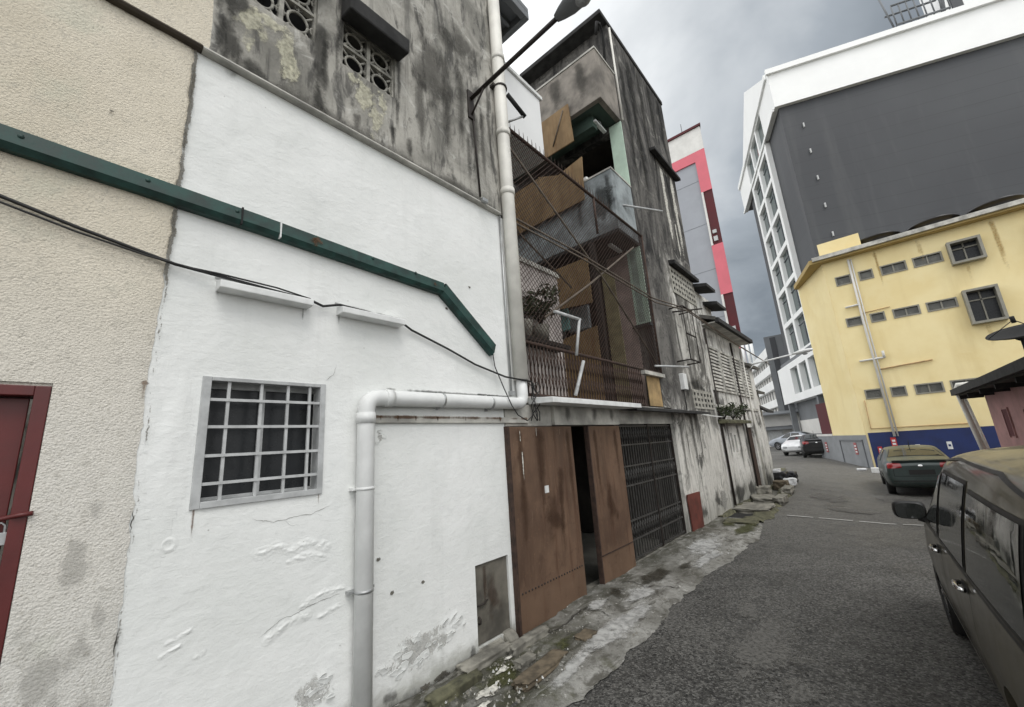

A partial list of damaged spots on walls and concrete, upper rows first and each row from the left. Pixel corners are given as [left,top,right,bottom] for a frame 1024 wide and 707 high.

damp [314,1,343,108]
damp [620,65,677,196]
damp [736,481,756,500]
peeling [375,613,466,680]
spalling [421,668,457,690]